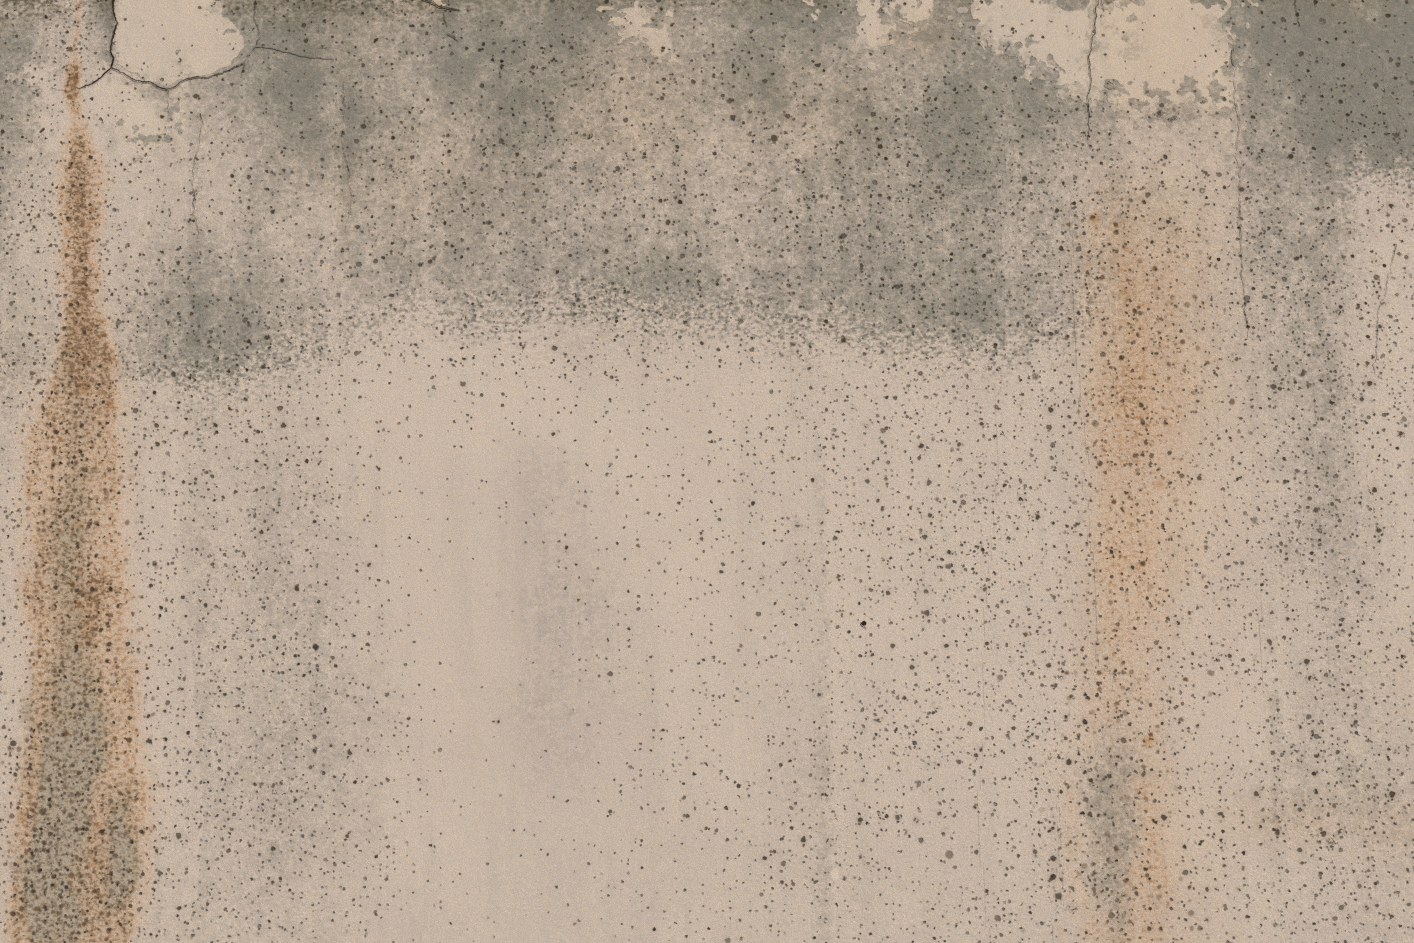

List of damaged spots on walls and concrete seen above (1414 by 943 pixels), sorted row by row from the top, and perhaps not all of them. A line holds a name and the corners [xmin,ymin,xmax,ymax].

peeling [7,54,43,131]
peeling [106,0,244,163]
crack [51,0,353,254]
peeling [596,0,684,66]
peeling [802,0,821,21]
peeling [846,0,1259,133]
crack [1086,0,1105,139]
corrosion [0,0,205,943]
water stain [107,0,1120,943]
corrosion [977,101,1303,943]